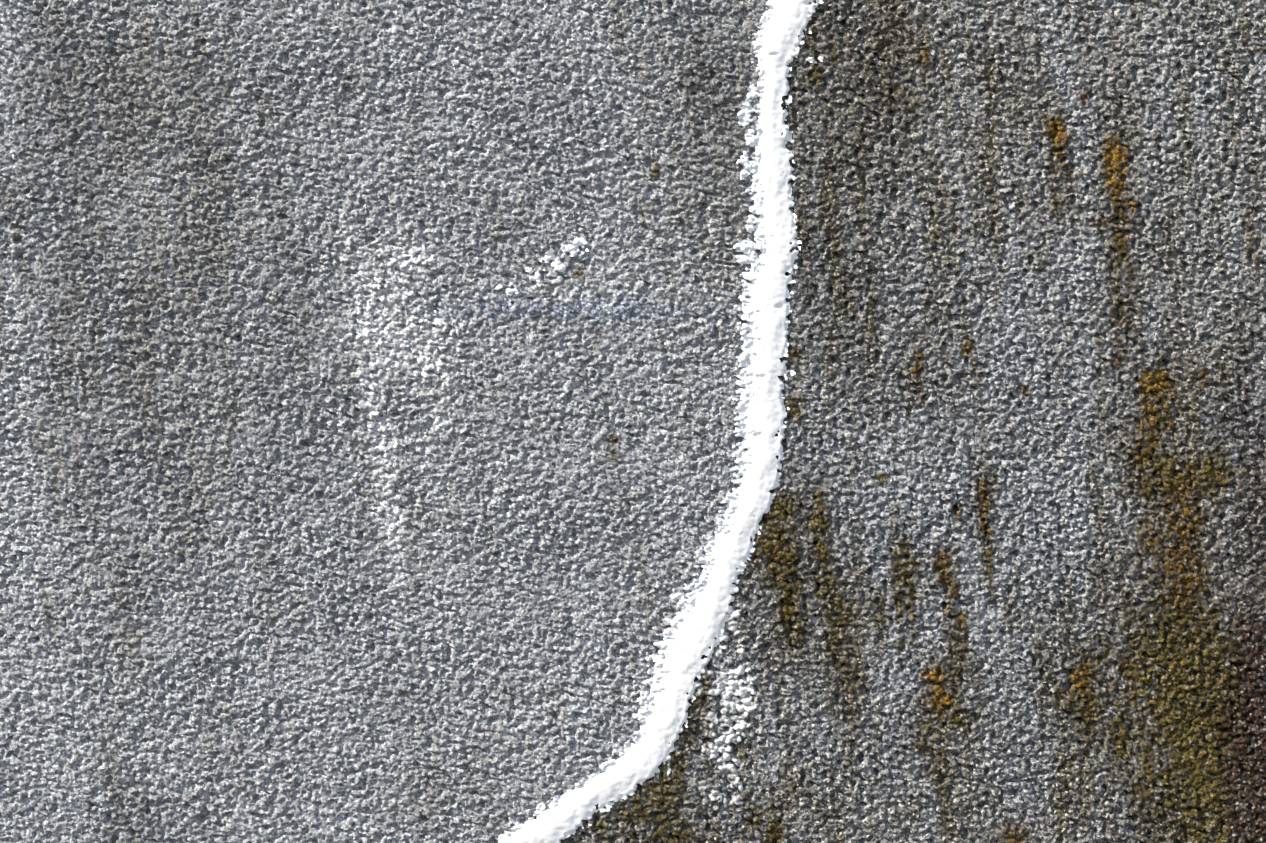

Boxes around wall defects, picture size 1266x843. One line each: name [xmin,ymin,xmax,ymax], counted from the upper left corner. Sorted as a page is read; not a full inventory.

corrosion [1046,116,1070,220]
corrosion [1098,136,1136,333]
crack [497,0,824,843]
corrosion [786,394,806,422]
corrosion [959,337,977,381]
corrosion [975,476,995,606]
corrosion [1129,365,1232,608]
corrosion [912,550,974,780]
corrosion [1054,651,1129,761]